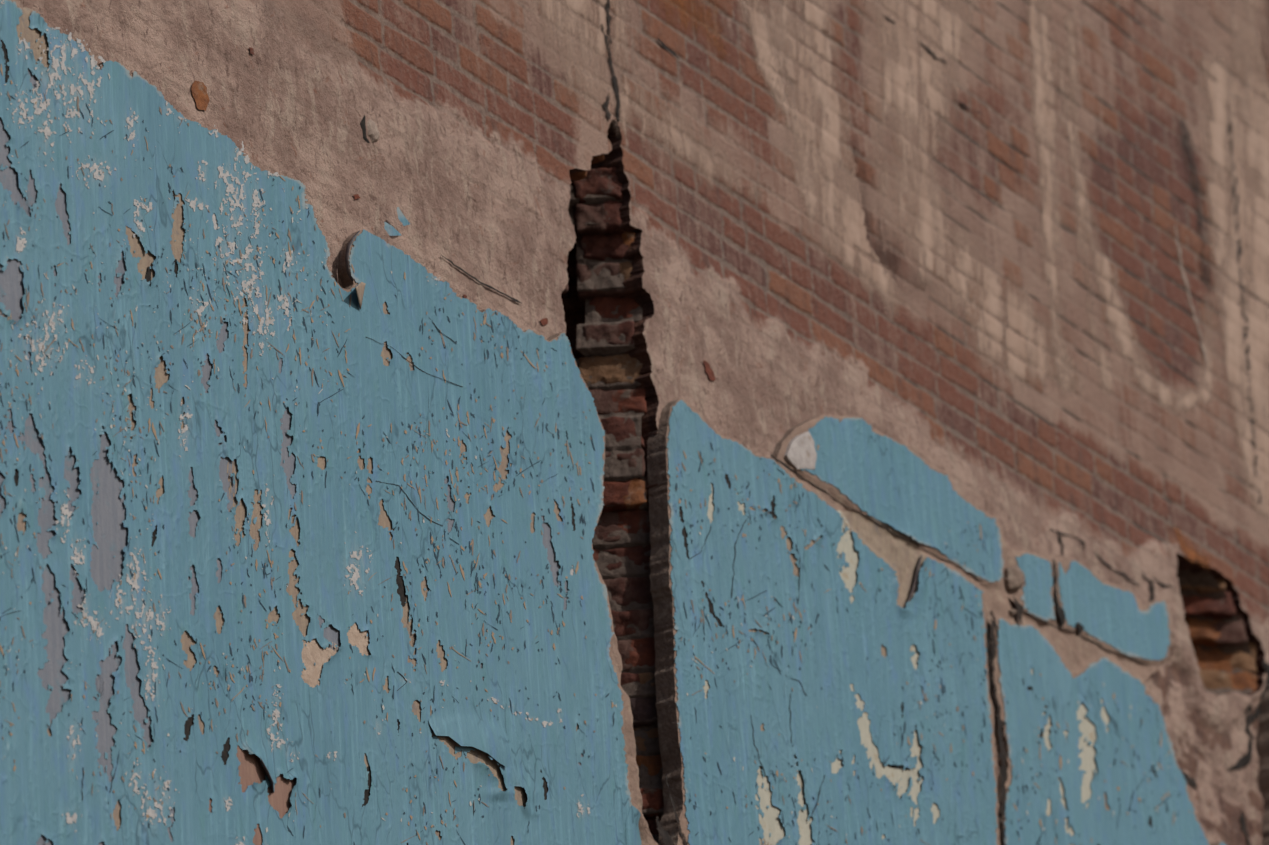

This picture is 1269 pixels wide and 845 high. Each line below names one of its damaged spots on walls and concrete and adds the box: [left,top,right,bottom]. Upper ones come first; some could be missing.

crack [602,0,620,121]
crack [657,38,679,59]
peeling [0,7,595,845]
crack [561,154,688,845]
crack [689,516,749,598]
crack [771,455,982,581]
crack [786,675,807,743]
peeling [672,443,987,845]
crack [986,528,1172,845]
spalling [1176,568,1258,695]